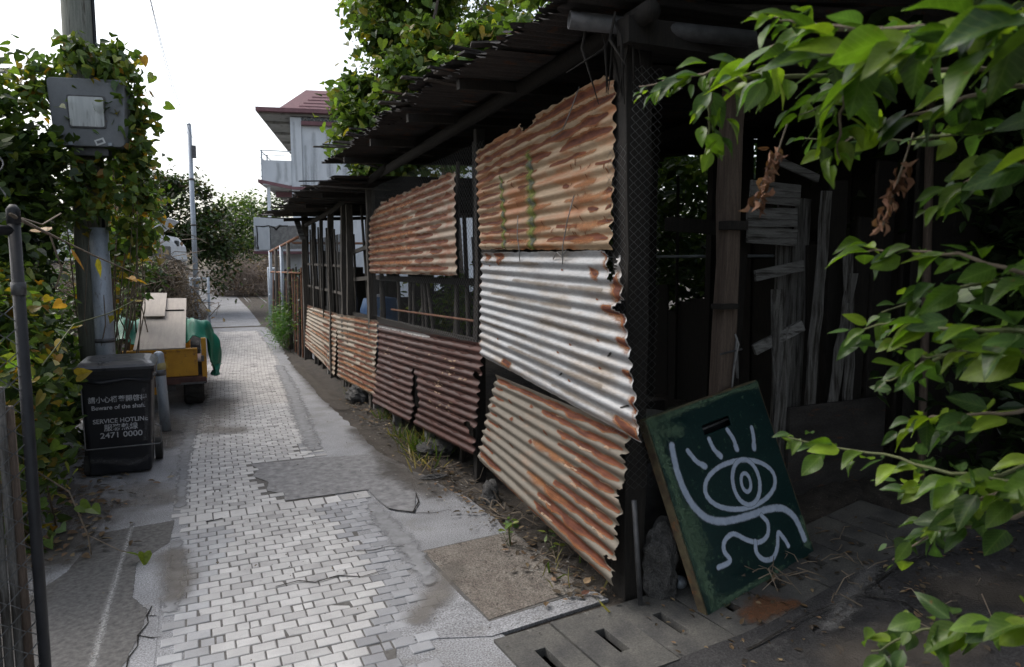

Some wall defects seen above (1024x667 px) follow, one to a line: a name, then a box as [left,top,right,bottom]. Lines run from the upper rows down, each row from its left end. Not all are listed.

rust [369,175,452,275]
rust [477,80,630,353]
rust [305,306,481,437]
crack [389,493,448,513]
rust [480,379,640,578]